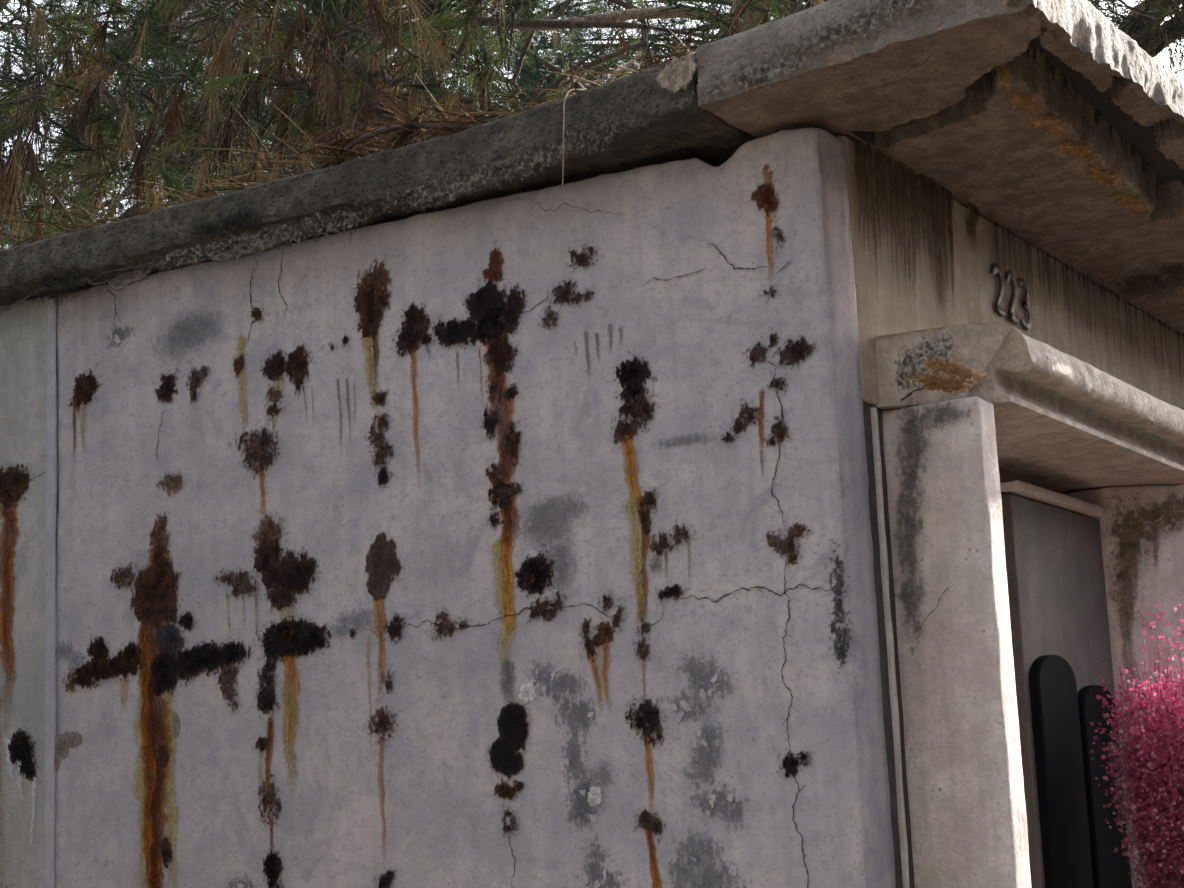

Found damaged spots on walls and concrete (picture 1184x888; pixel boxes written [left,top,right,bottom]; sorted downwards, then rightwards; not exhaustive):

rust [63,335,333,888]
rust [329,259,394,488]
rust [350,532,406,831]
rust [395,247,565,838]
crack [358,561,835,888]
rust [580,355,690,888]
crack [640,243,792,287]
crack [768,361,785,527]
water stain [829,543,852,668]
water stain [855,137,954,307]
water stain [895,402,970,633]
water stain [1107,494,1184,670]